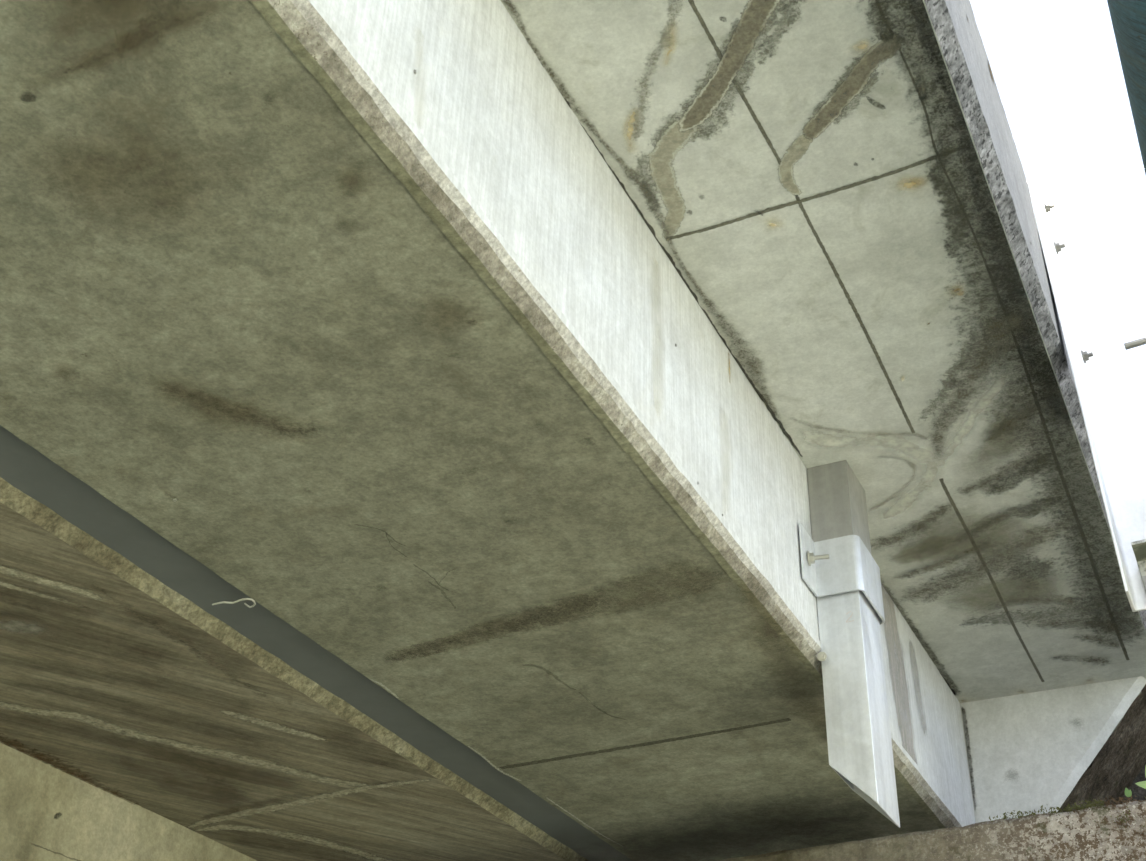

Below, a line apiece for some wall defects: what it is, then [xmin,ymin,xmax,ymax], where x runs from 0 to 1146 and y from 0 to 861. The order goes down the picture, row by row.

damp [637,0,802,238]
damp [778,0,1143,764]
damp [389,567,714,660]